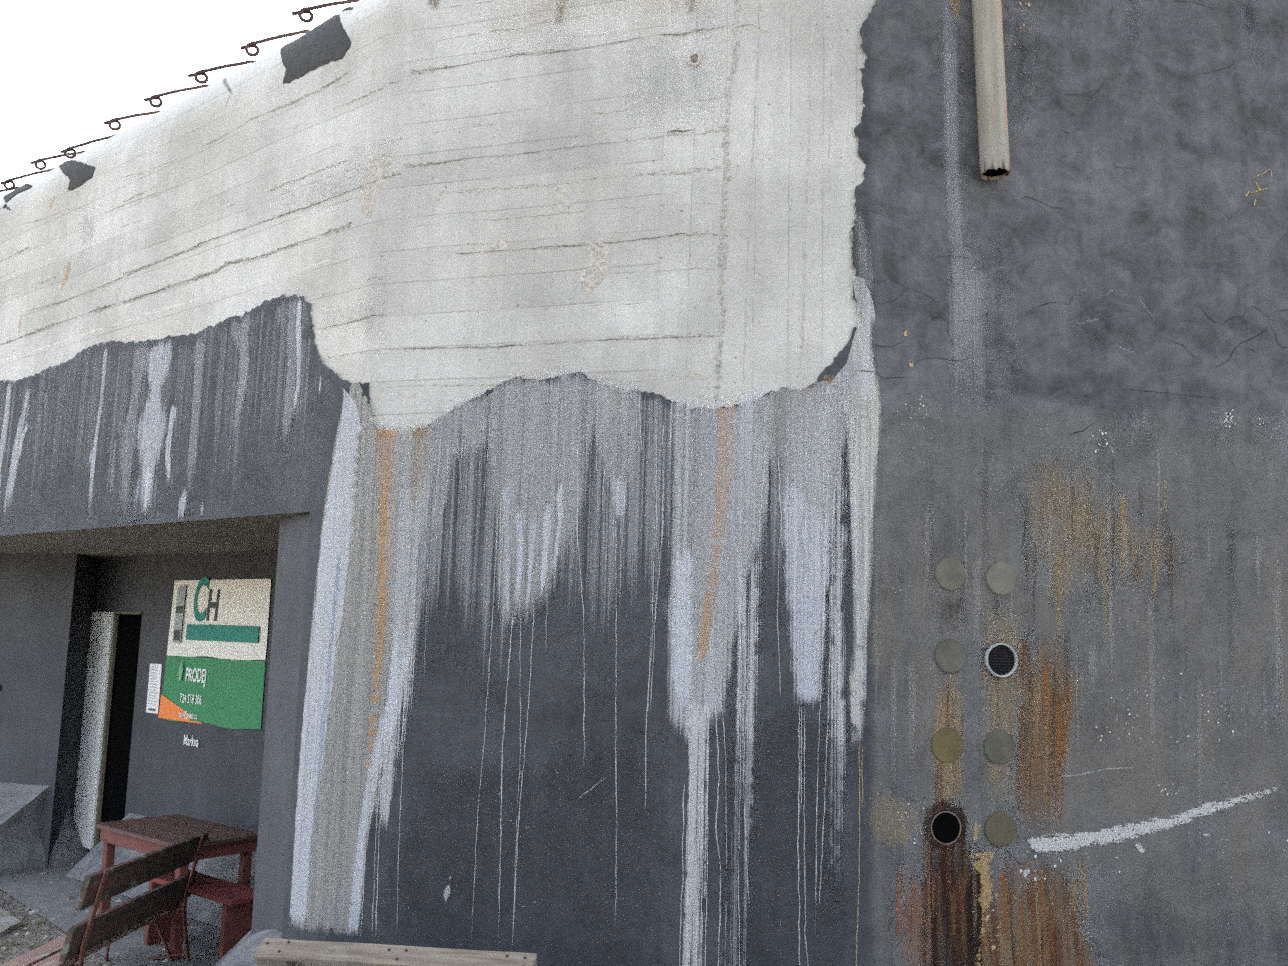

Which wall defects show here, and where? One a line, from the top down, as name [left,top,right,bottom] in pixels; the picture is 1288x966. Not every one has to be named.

flaking render [0,0,875,435]
water stain [5,392,30,501]
water stain [138,344,170,505]
water stain [188,342,203,477]
rust [367,429,397,749]
water stain [290,370,637,932]
rust [698,405,732,648]
water stain [645,276,879,966]
crack [862,255,987,379]
crack [1167,295,1288,366]
rust [921,800,1091,966]